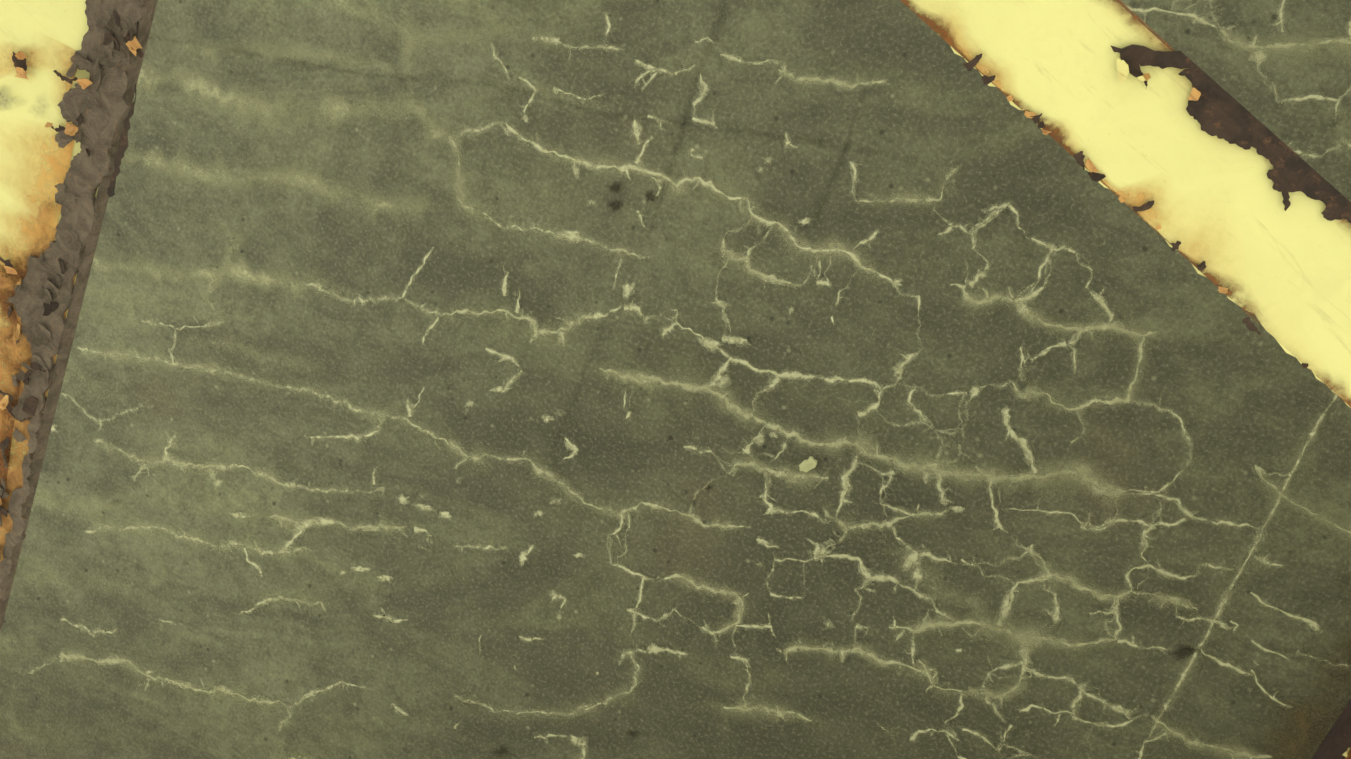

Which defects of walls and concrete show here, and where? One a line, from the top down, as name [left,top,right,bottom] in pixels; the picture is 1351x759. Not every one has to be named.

crack [1126,0,1351,67]
damp [137,68,282,114]
crack [962,53,996,85]
corrosion [900,0,1088,170]
peeling [1024,111,1051,135]
crack [449,15,920,323]
peeling [1085,158,1106,182]
damp [145,263,303,293]
corrosion [1100,180,1254,317]
corrosion [0,0,158,633]
crack [37,162,1351,759]
damp [399,495,451,518]